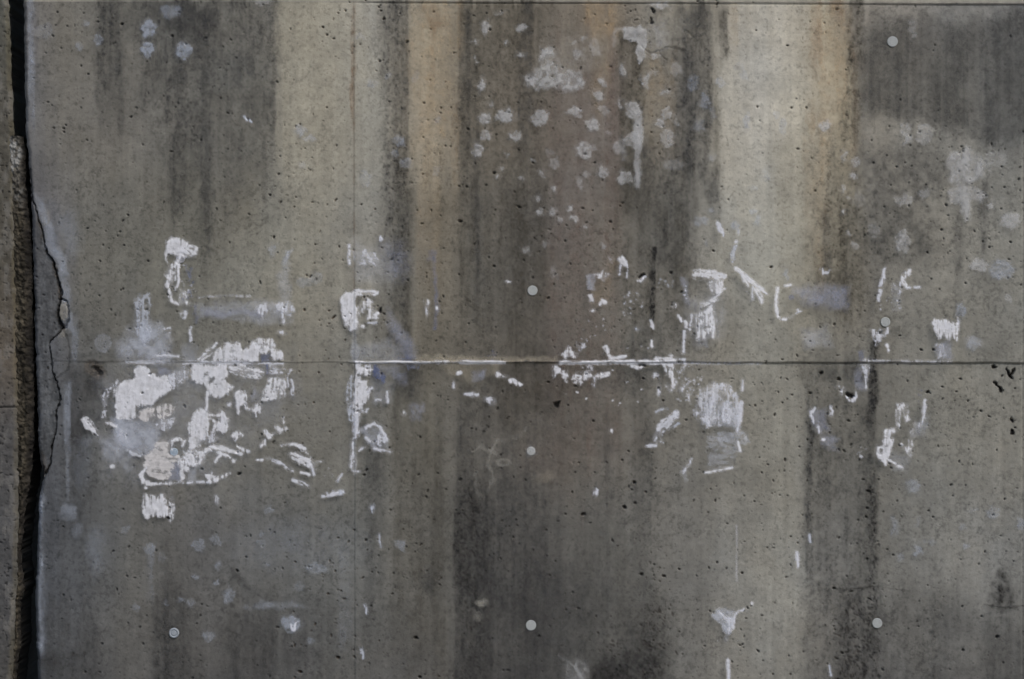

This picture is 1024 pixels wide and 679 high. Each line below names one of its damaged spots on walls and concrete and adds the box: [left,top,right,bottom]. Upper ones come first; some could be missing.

crack [30,168,70,479]
leakage [95,0,122,123]
peeling [165,238,198,319]
leakage [138,0,250,231]
peeling [81,301,321,520]
peeling [340,289,382,331]
peeling [321,355,541,498]
leakage [457,0,729,411]
peeling [552,320,719,401]
leakage [813,0,1024,320]
peeling [932,317,959,359]
leakage [453,415,664,679]